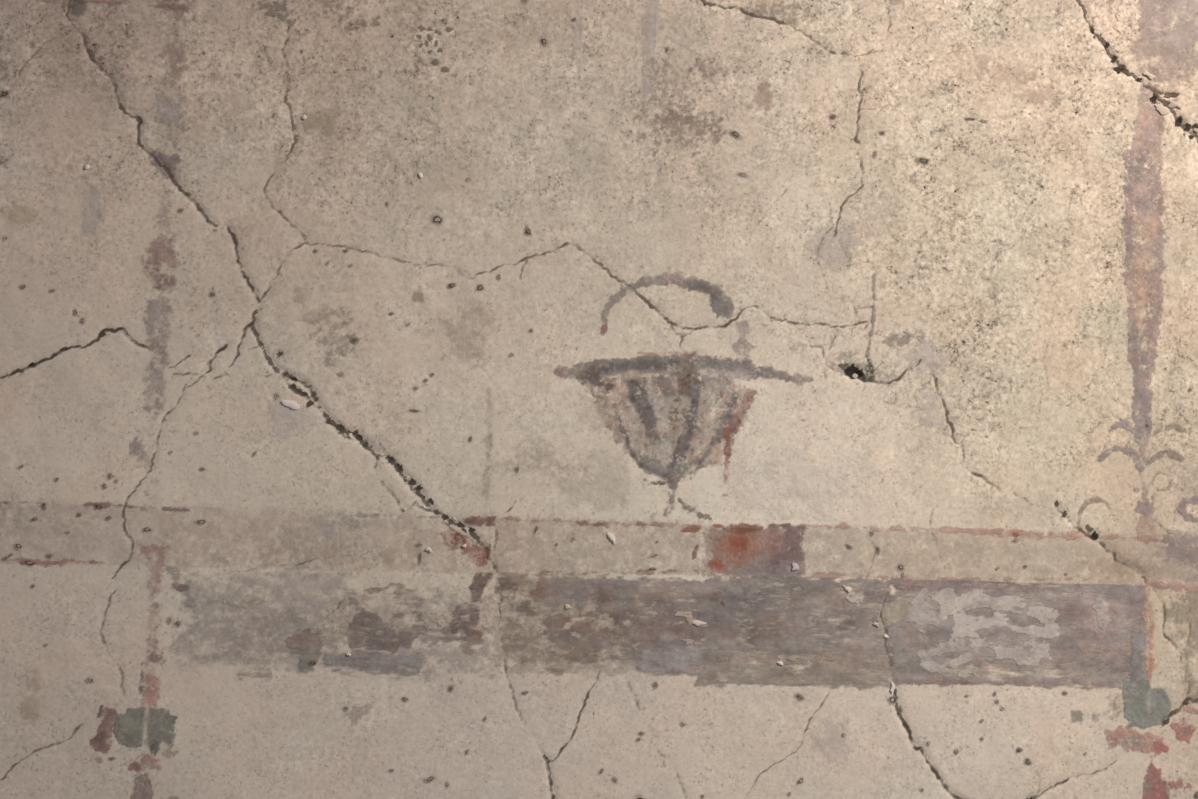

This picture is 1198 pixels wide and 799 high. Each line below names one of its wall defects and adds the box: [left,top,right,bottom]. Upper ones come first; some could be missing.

crack [701,0,870,249]
crack [1077,0,1198,139]
crack [2,327,149,378]
crack [67,0,512,693]
crack [476,242,1146,581]
crack [1164,604,1191,658]
crack [2,723,84,779]
crack [544,676,599,799]
crack [880,597,961,799]
crack [1026,760,1117,799]
crack [1163,686,1198,725]